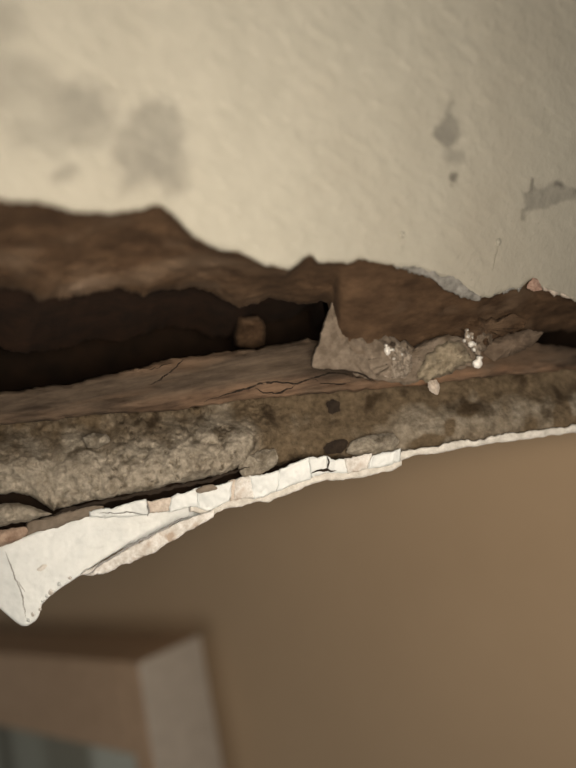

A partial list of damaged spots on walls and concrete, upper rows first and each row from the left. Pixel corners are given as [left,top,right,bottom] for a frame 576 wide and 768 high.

flaking render [0,200,576,626]